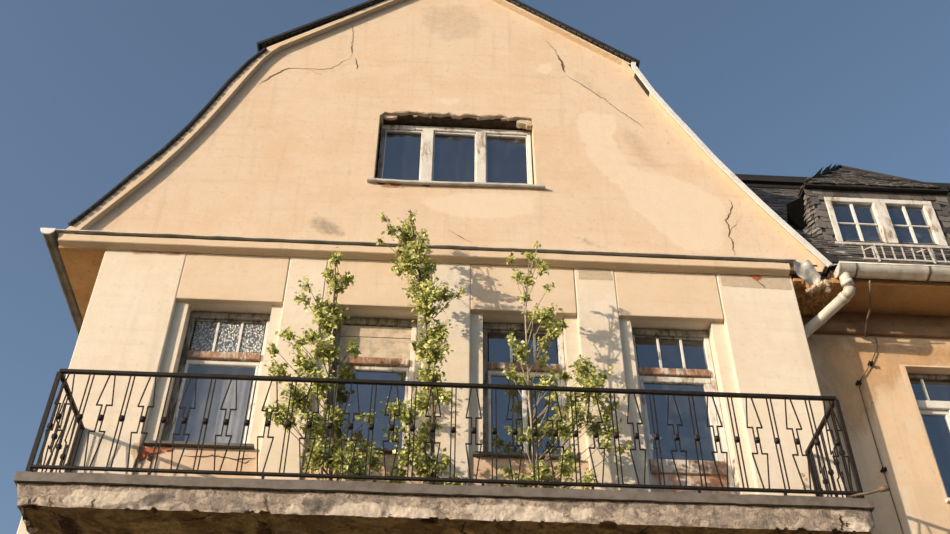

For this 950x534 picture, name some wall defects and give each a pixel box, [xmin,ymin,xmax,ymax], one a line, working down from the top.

crack [263,25,358,82]
crack [531,40,637,122]
crack [725,200,737,255]
crack [748,275,766,289]